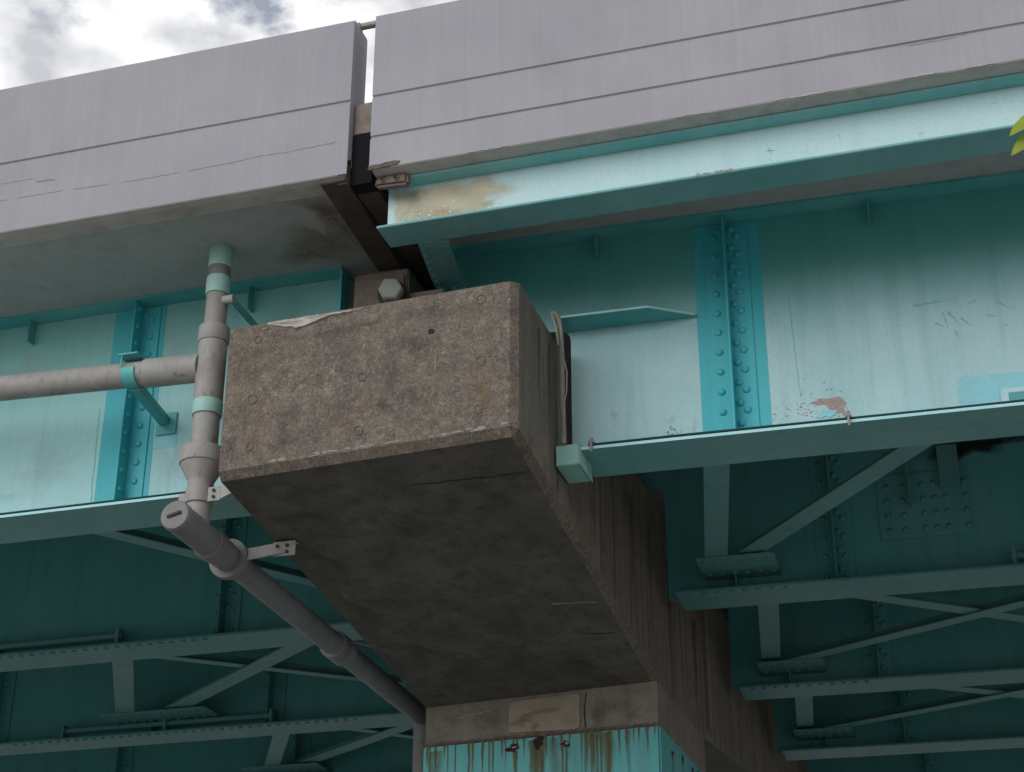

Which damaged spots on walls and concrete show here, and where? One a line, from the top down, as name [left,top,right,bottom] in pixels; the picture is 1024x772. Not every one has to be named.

rust [397,182,502,221]
spalling [262,307,369,330]
rust [424,722,657,772]